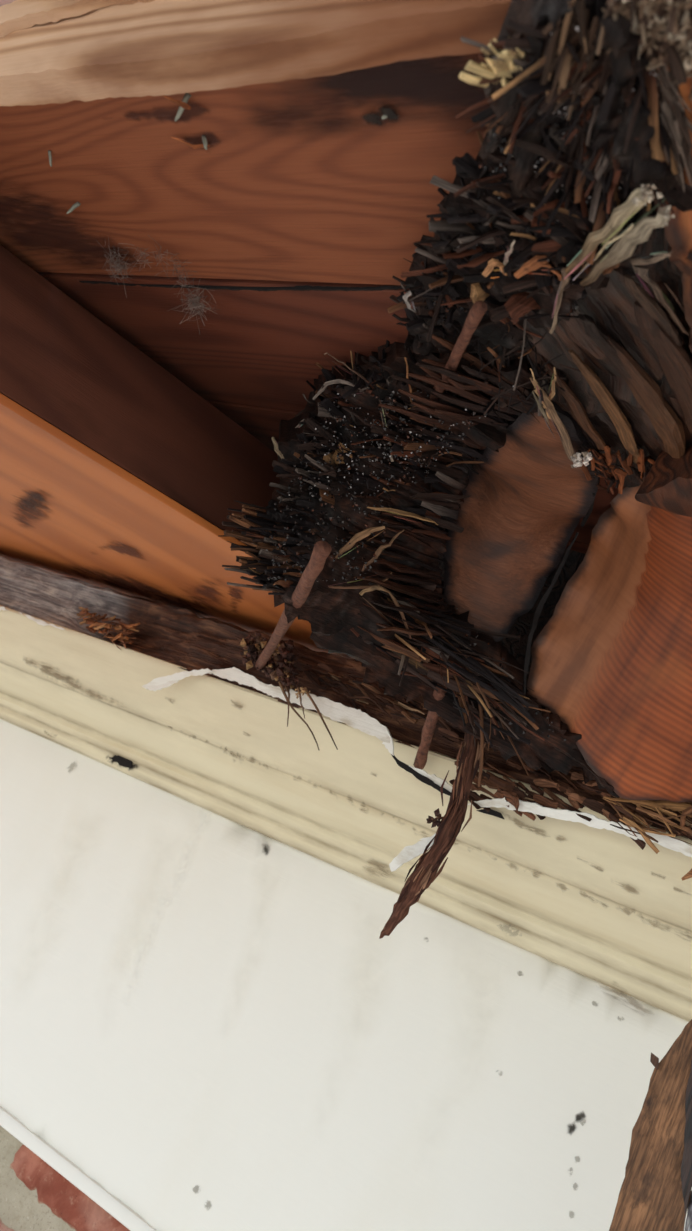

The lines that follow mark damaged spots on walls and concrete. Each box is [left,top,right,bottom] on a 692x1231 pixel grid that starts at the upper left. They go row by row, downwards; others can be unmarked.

leakage [0,197,131,265]
leakage [16,492,48,526]
leakage [109,544,142,559]
leakage [74,568,242,618]
peeling [142,667,394,756]
peeling [410,766,452,792]
peeling [468,797,692,857]
peeling [389,833,436,872]